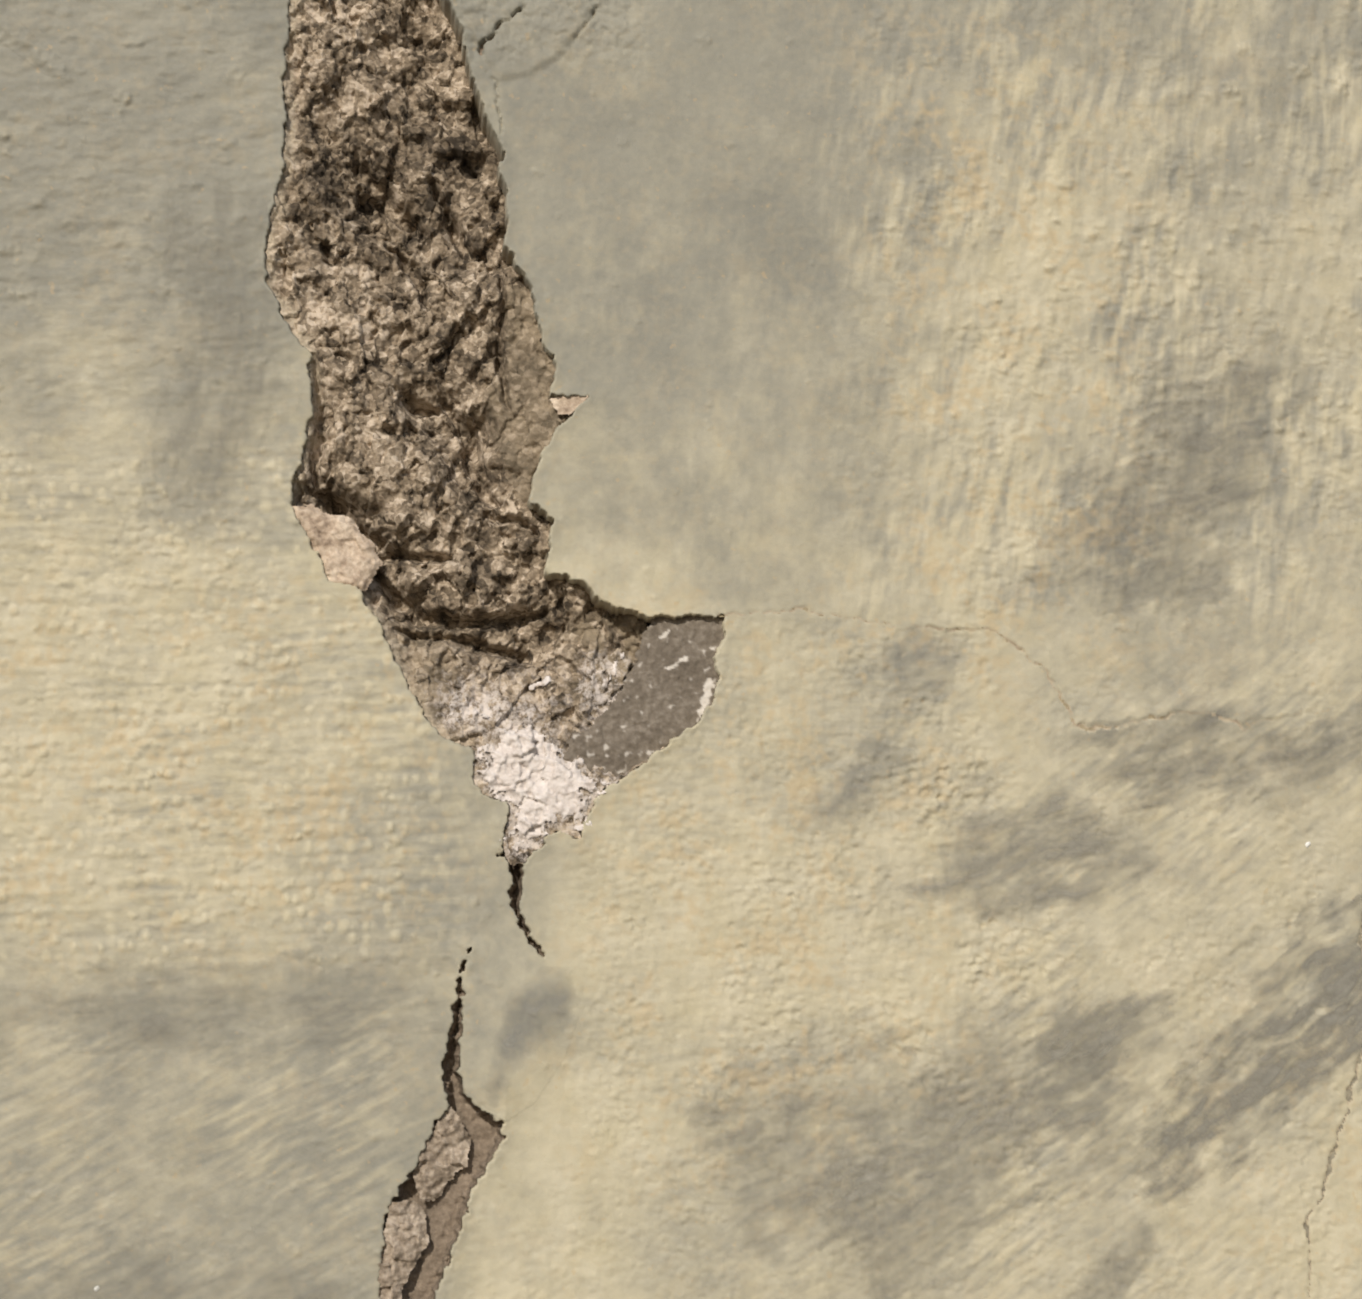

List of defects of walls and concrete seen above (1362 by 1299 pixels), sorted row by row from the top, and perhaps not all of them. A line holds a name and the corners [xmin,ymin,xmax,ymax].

spalling [265,0,724,866]
crack [939,627,1117,731]
crack [496,853,544,957]
crack [378,948,505,1299]
crack [1303,1053,1362,1297]